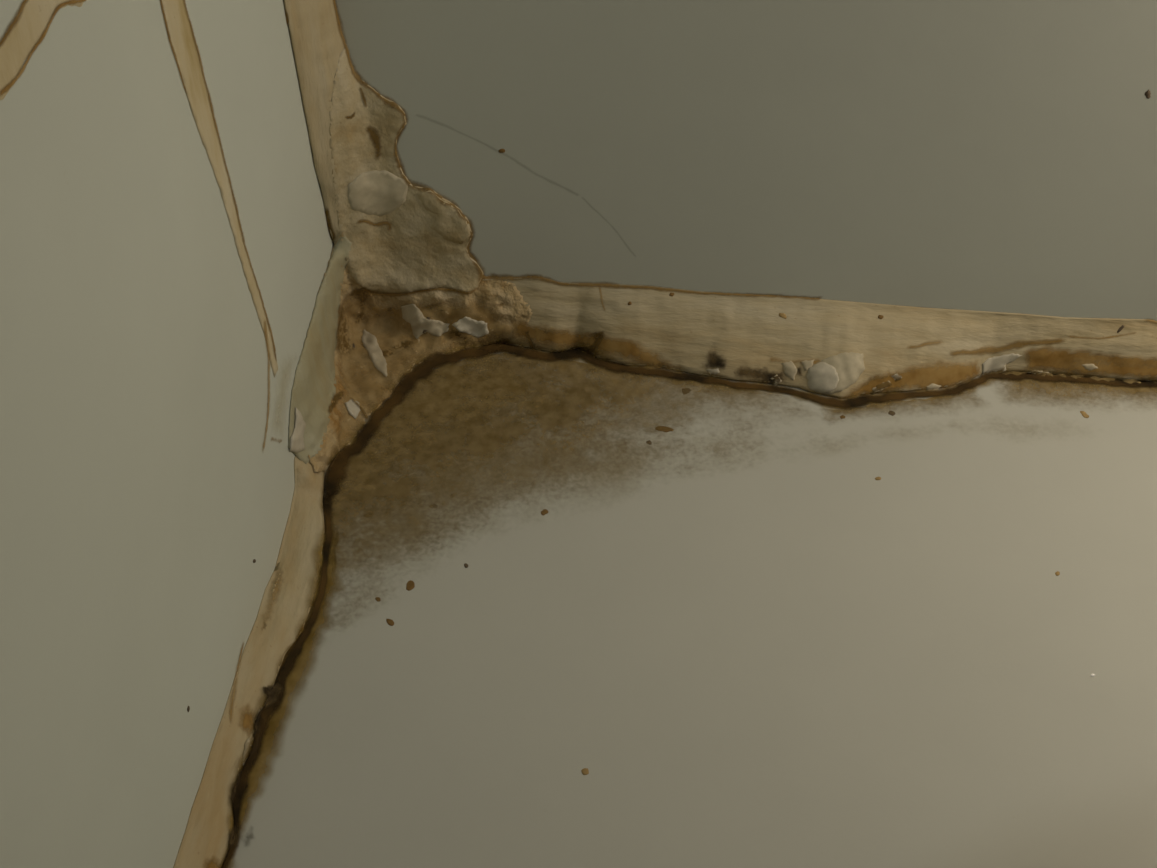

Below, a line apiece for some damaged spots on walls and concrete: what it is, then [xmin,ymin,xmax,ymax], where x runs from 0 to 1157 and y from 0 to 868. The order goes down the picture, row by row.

peeling [401,304,489,339]
peeling [362,329,387,377]
peeling [770,352,865,395]
peeling [982,353,1022,374]
leakage [999,371,1157,399]
peeling [345,399,360,419]
leakage [328,353,783,570]
crack [220,288,1157,868]